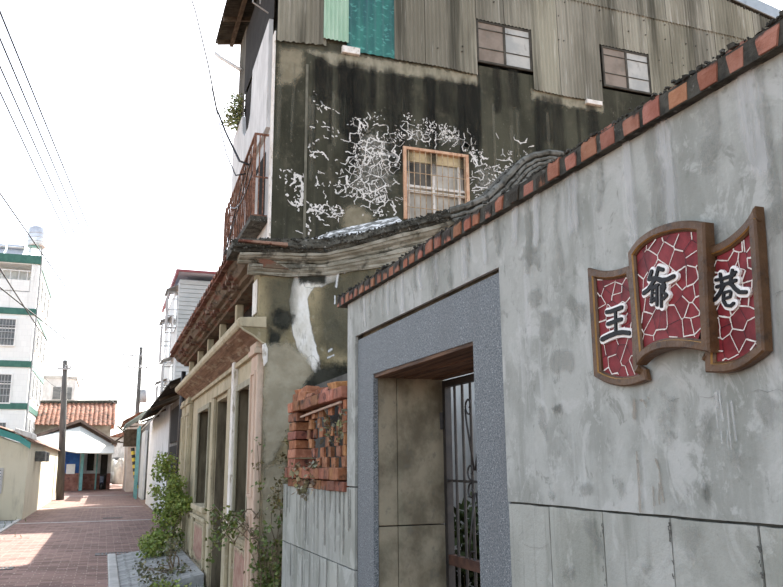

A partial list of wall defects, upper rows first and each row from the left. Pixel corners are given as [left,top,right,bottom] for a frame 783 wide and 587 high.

water stain [309,50,480,173]
crack [279,91,534,235]
water stain [531,90,603,152]